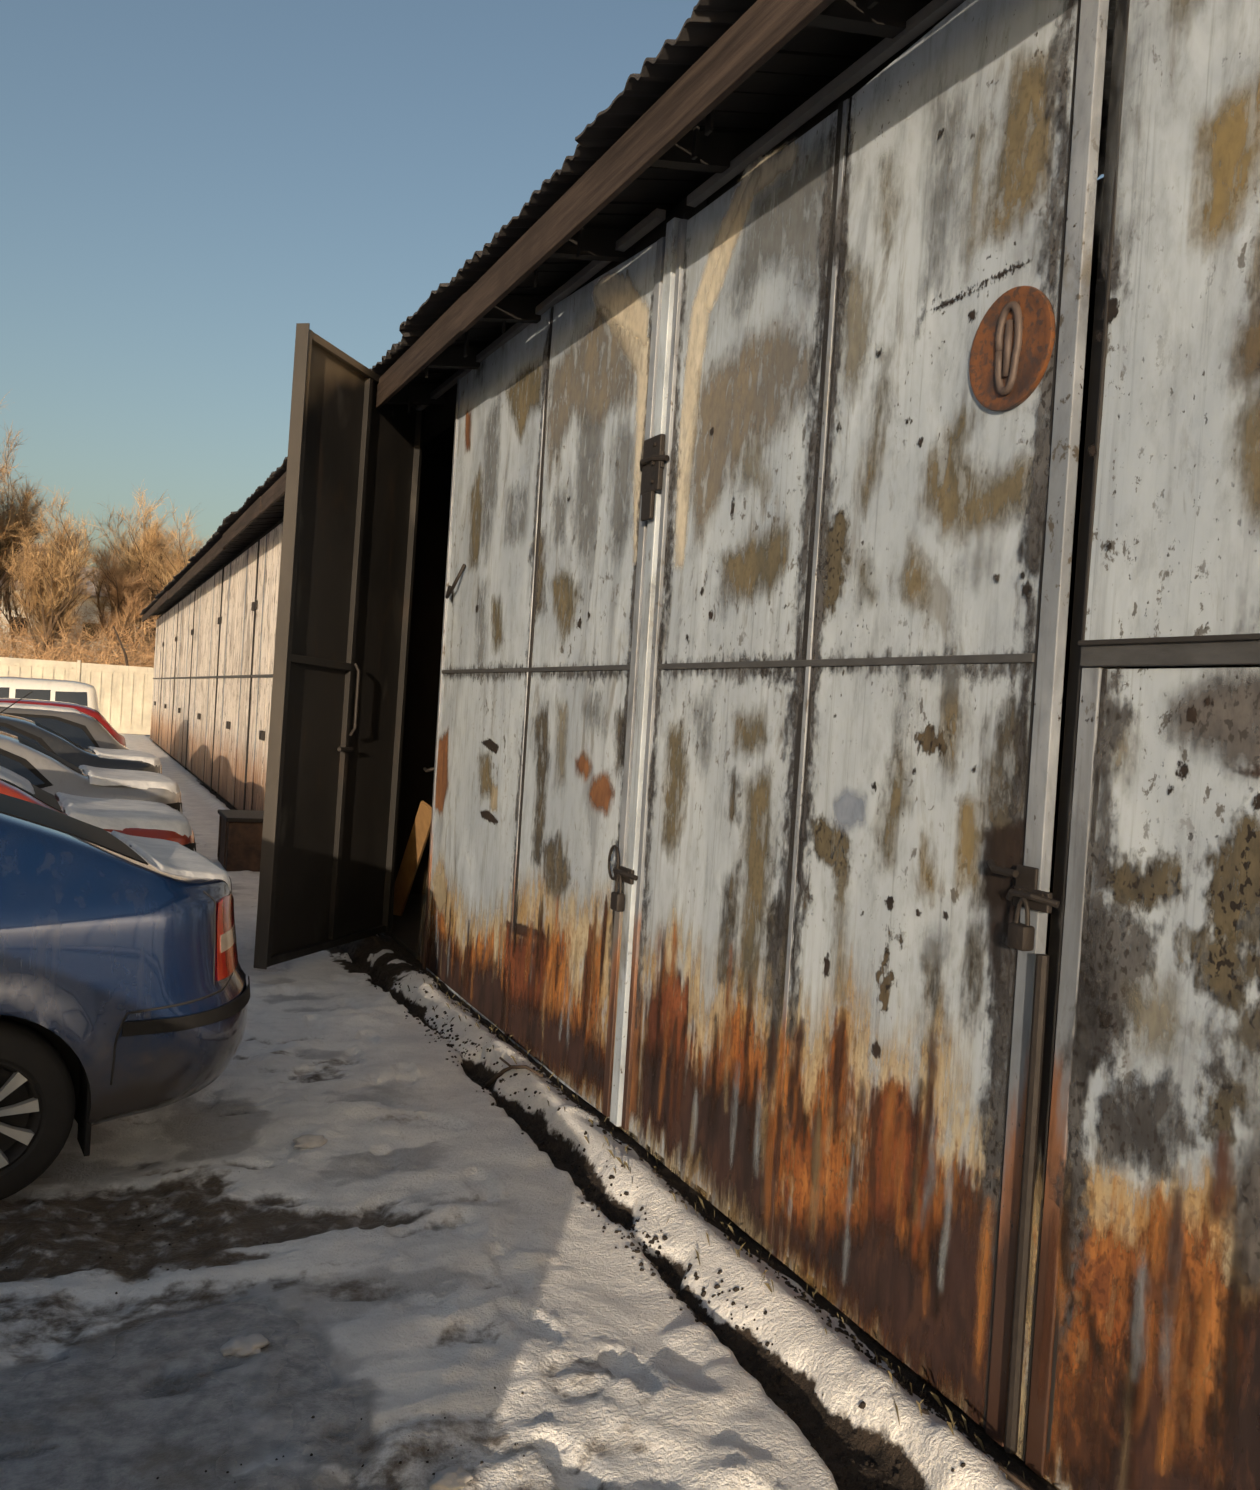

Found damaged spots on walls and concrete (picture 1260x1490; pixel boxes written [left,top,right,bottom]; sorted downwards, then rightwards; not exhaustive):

rust [435,731,448,813]
rust [420,821,1026,1427]
rust [1015,906,1260,1490]
peeling [1106,853,1182,913]
spalling [1168,761,1188,795]
peeling [1175,792,1260,1146]